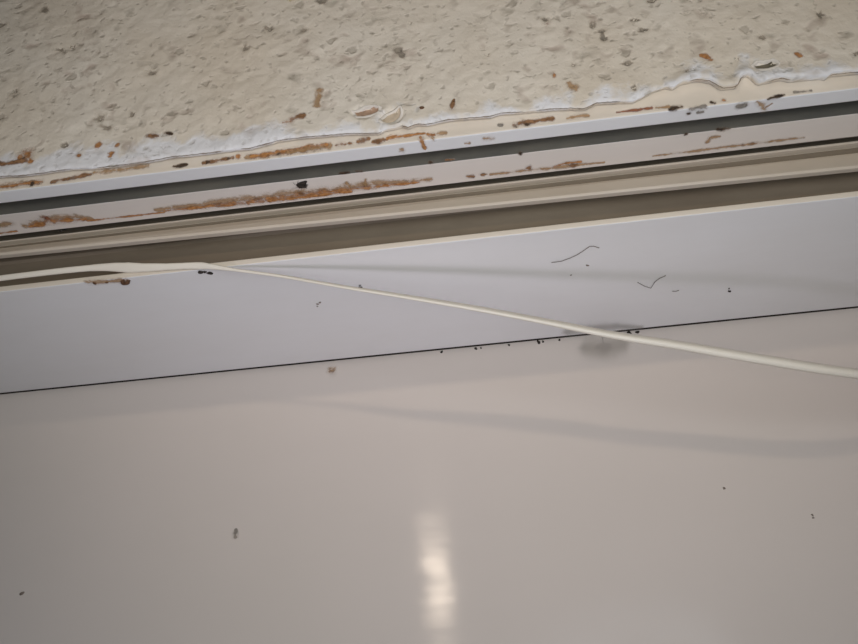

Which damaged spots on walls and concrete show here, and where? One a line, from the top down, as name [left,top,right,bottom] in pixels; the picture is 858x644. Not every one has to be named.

spalling [751,58,781,71]
spalling [351,104,404,124]
corrosion [497,116,555,127]
corrosion [616,105,670,113]
corrosion [202,131,447,165]
corrosion [683,136,756,153]
corrosion [466,161,605,178]
corrosion [0,178,433,234]